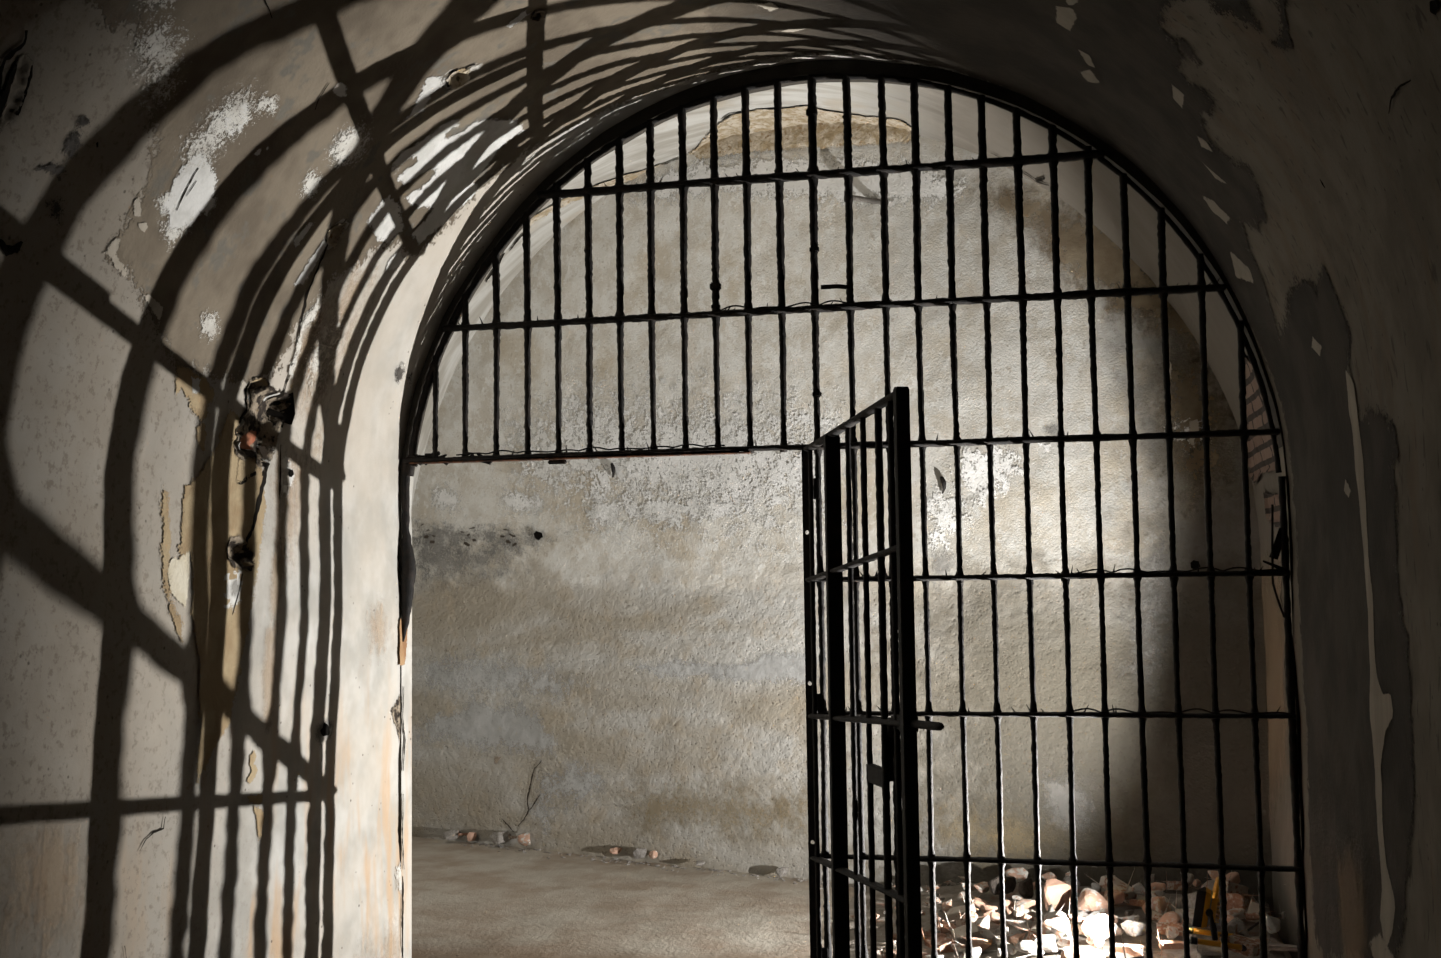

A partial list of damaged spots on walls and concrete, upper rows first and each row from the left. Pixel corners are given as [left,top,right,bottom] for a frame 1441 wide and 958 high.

peeling [1055,6,1077,31]
peeling [1080,69,1100,84]
spalling [486,105,911,282]
peeling [1203,196,1230,224]
spalling [1245,354,1278,483]
spalling [278,457,295,497]
spalling [1263,491,1280,528]
spalling [413,521,543,580]
peeling [159,406,267,783]
spalling [391,694,400,741]
peeling [247,750,265,841]
spalling [395,861,404,956]